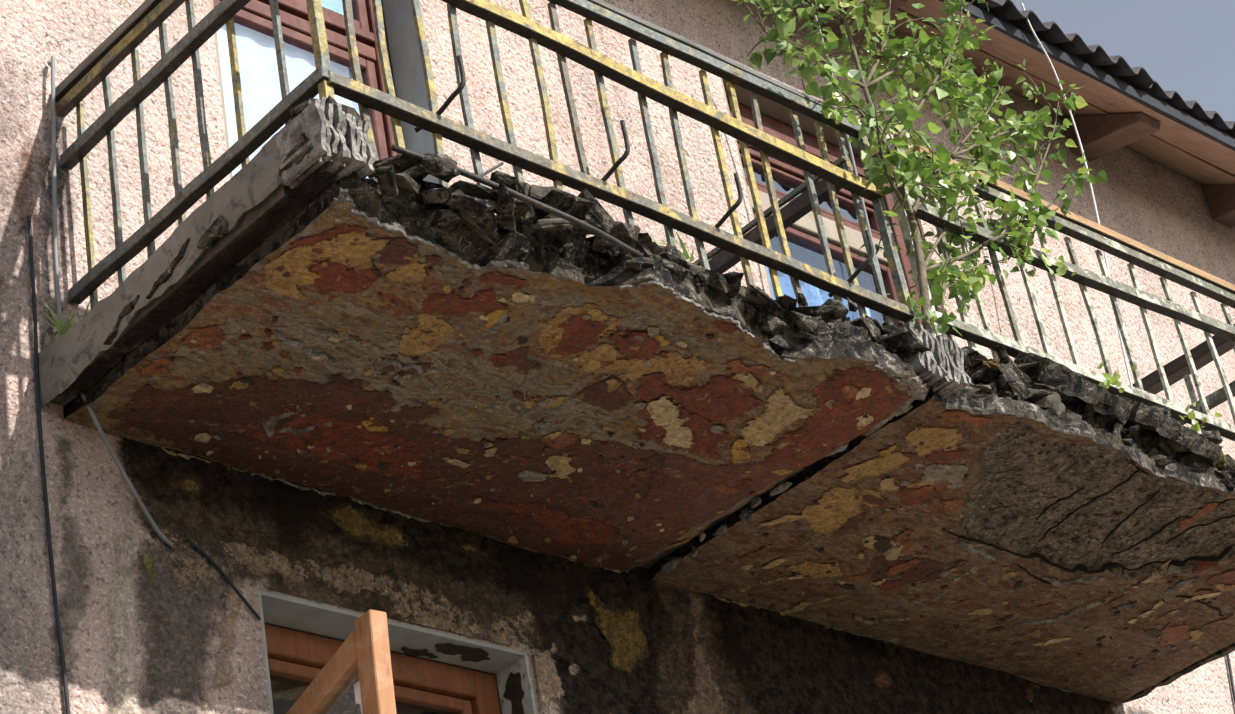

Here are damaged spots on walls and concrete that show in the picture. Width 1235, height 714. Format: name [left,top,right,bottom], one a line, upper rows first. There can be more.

peeling [103,95,932,572]
flaking render [160,527,580,714]
damp [110,438,1153,714]
spalling [703,345,1235,618]
peeling [925,596,1071,661]
crack [947,470,1235,616]
peeling [1078,553,1235,678]